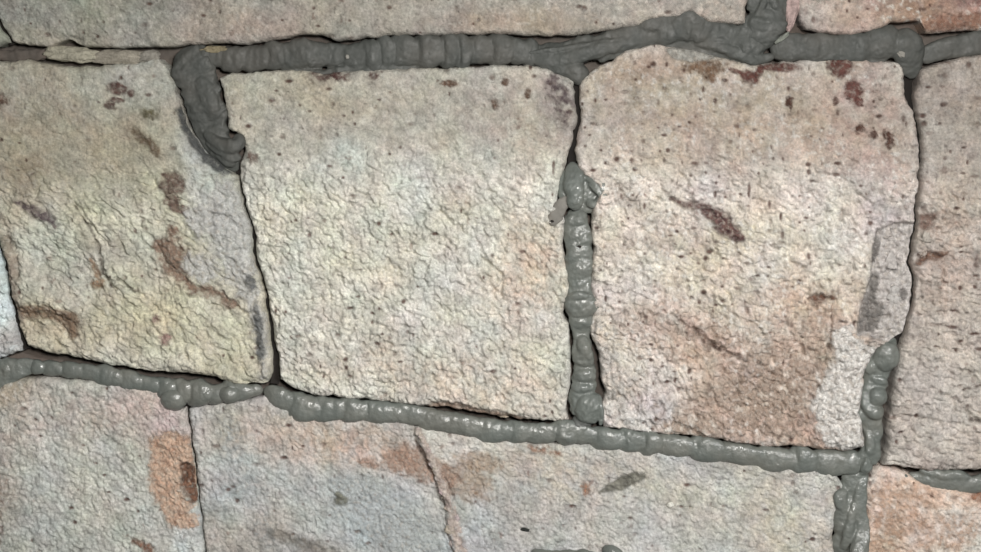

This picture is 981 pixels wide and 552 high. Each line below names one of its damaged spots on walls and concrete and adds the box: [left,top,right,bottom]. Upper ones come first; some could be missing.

crack [0,19,15,45]
crack [185,405,207,552]
crack [415,427,467,552]